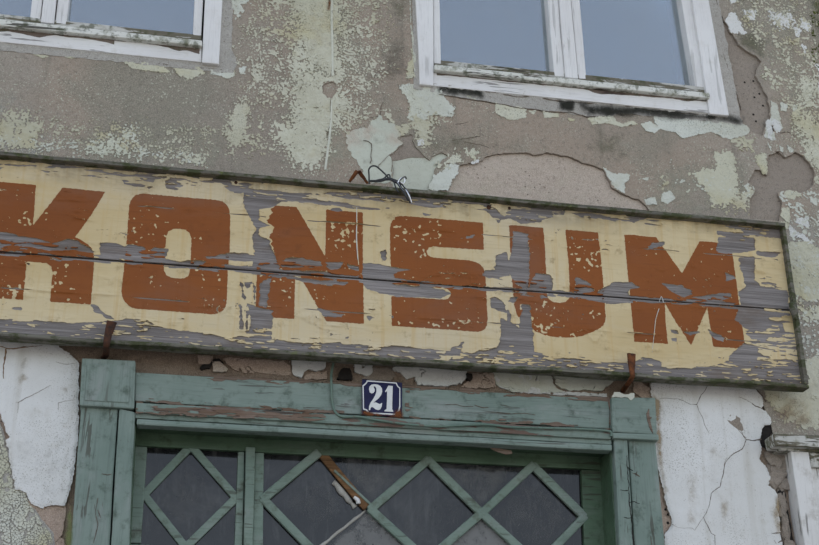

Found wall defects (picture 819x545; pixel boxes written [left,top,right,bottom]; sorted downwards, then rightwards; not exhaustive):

spalling [0,0,819,431]
crack [0,345,43,379]
spalling [28,501,66,545]
spalling [659,481,671,533]
crack [672,430,762,536]
spalling [759,425,797,545]